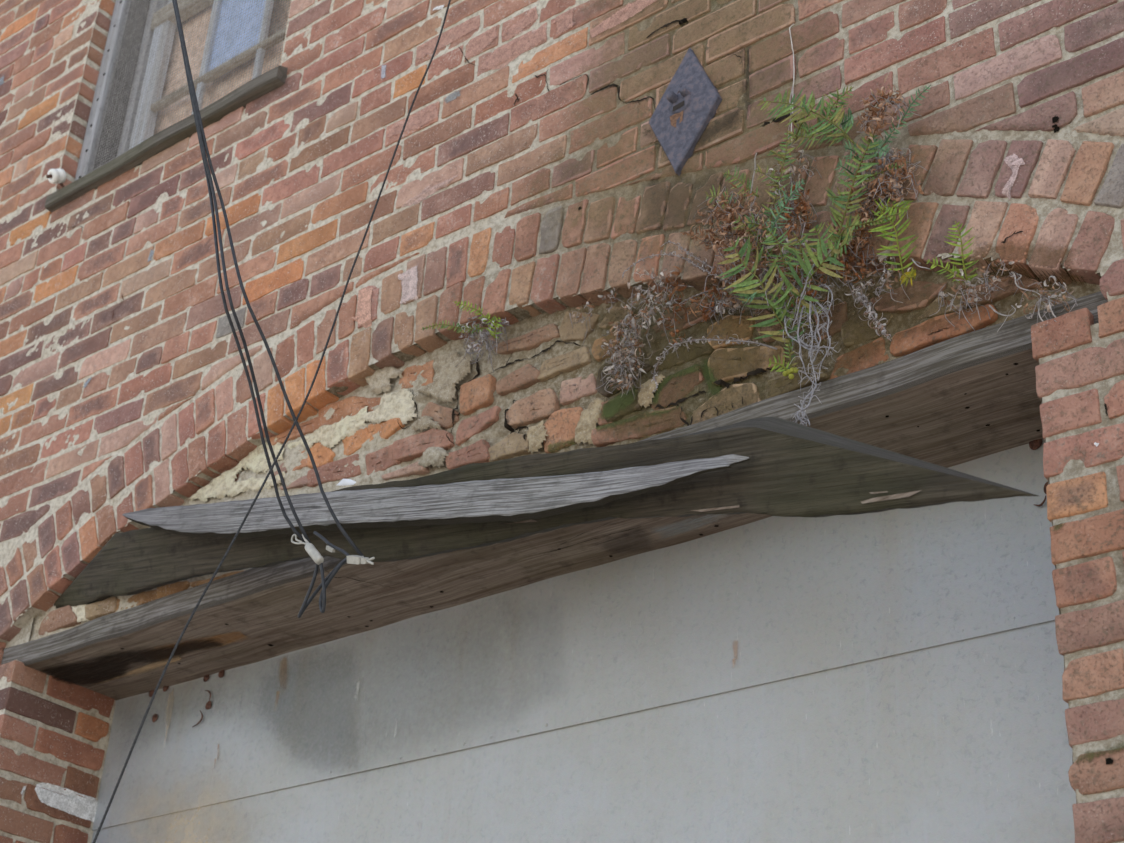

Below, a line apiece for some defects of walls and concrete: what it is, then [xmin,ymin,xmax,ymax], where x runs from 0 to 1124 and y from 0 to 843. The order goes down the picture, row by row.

crack [646,20,689,38]
crack [760,113,797,127]